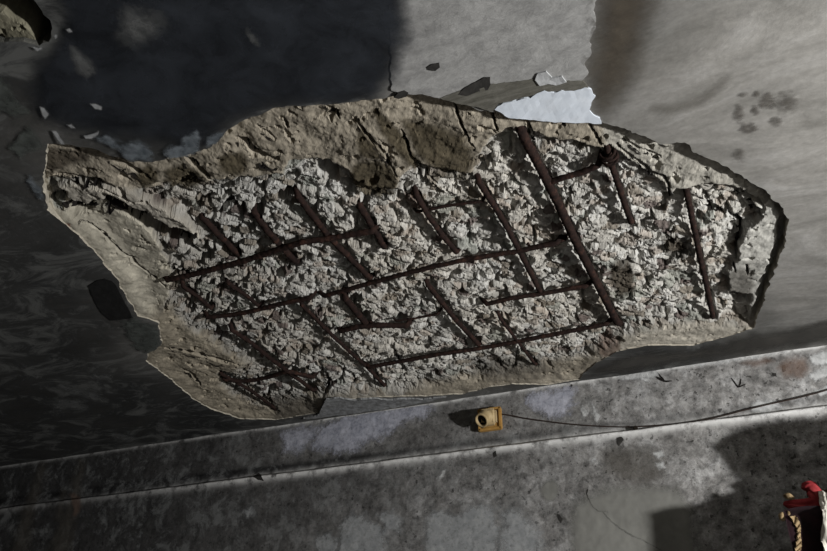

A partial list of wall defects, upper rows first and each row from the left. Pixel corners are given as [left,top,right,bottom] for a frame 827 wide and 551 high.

mould [735,92,793,133]
corrosion [219,153,248,175]
spalling [27,0,789,420]
corrosion [664,236,687,258]
corrosion [610,259,635,295]